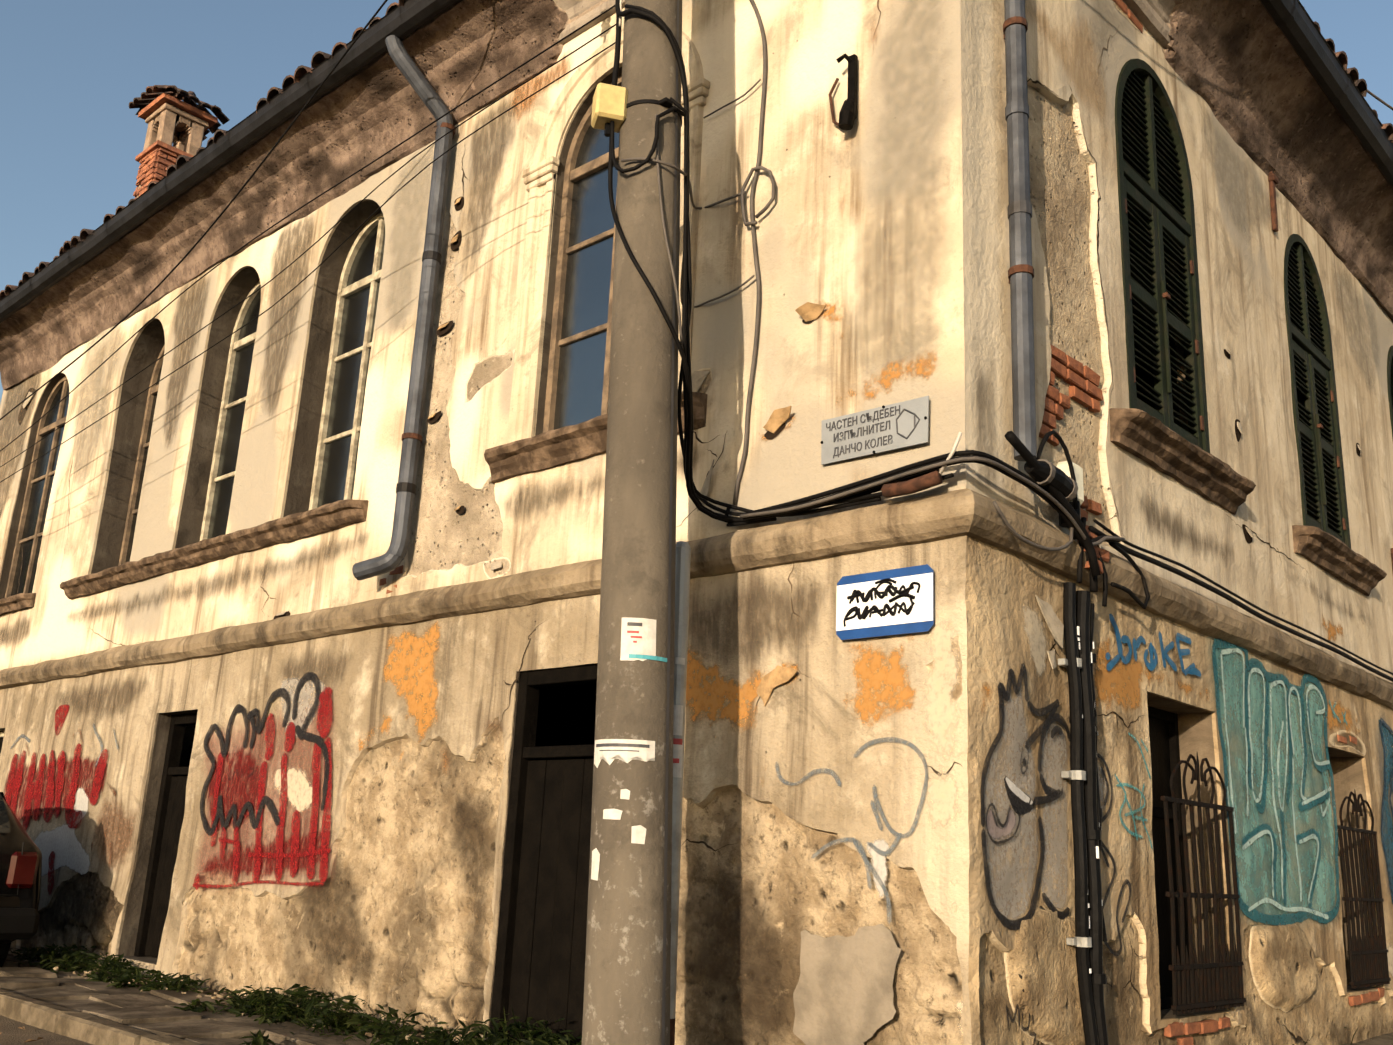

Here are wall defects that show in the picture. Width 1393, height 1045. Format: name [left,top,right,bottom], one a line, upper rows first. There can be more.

water stain [467,105,515,255]
water stain [165,281,206,440]
water stain [264,221,312,408]
flaking render [379,196,515,594]
flaking render [1027,78,1124,574]
water stain [1146,504,1211,547]
peeling [757,665,797,706]
flaking render [16,872,124,968]
flaking render [172,717,506,1042]
flaking render [675,784,1047,1045]
flaking render [1103,912,1393,1045]